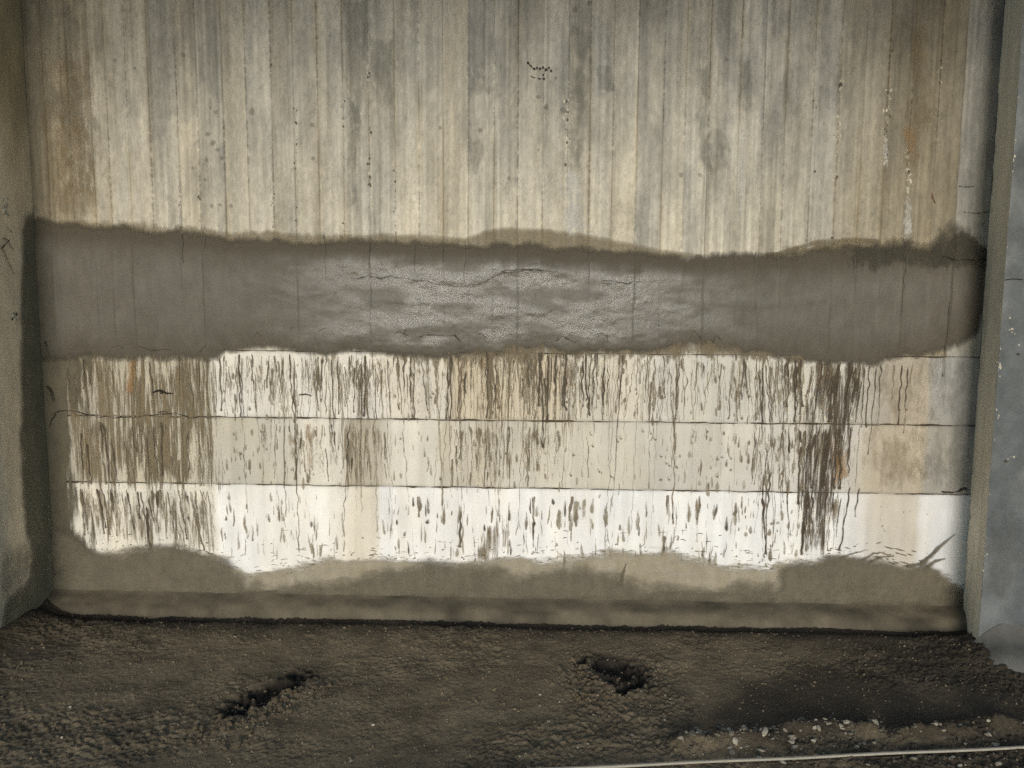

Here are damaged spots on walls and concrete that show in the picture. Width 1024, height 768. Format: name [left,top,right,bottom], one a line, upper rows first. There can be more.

water stain [771,239,877,255]
water stain [62,352,913,558]